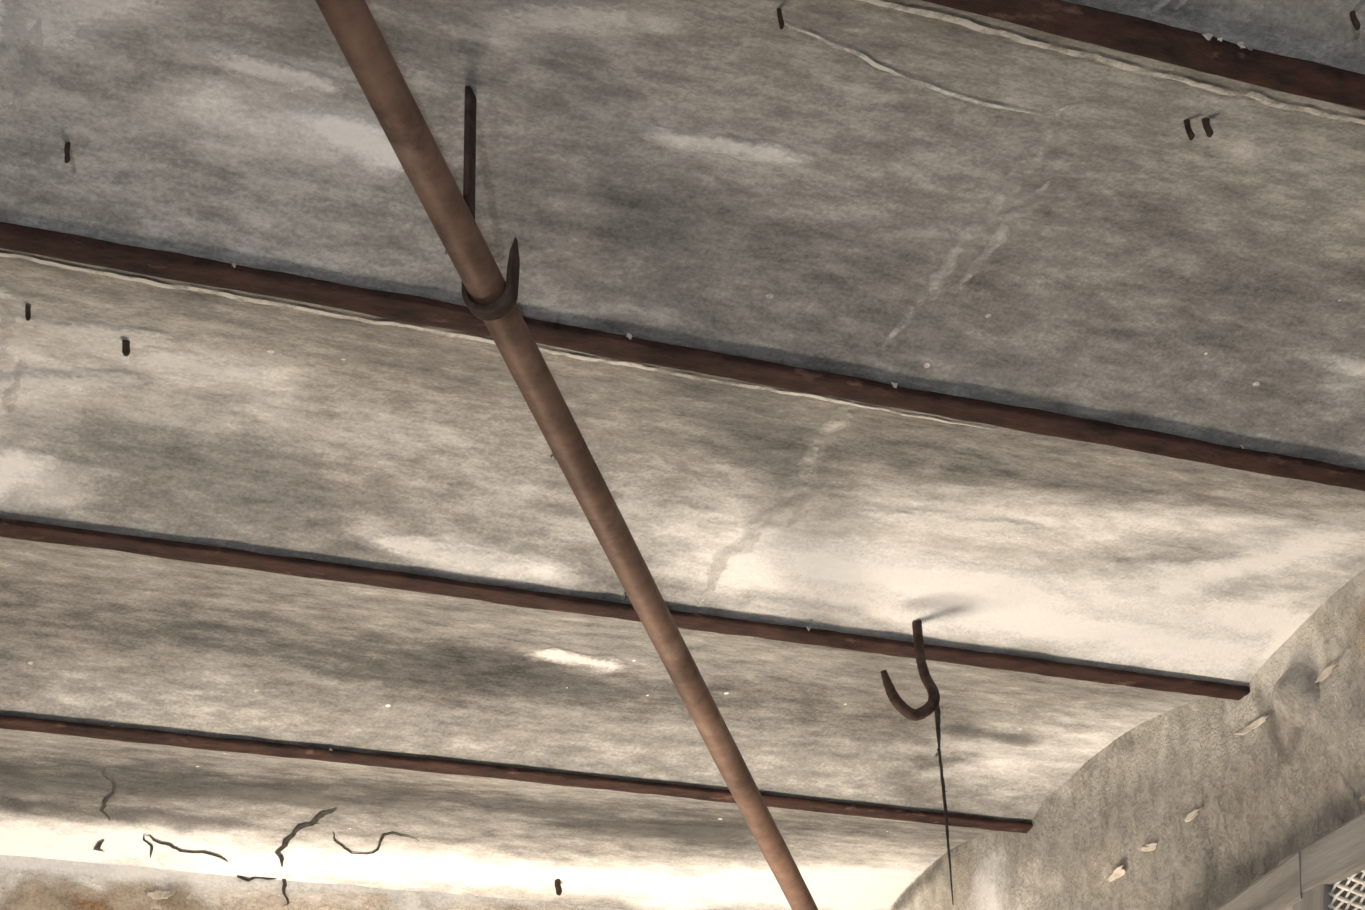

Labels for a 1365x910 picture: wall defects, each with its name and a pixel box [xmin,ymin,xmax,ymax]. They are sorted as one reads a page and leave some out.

leakage [0,0,166,50]
leakage [205,49,340,93]
leakage [646,128,806,163]
leakage [0,289,171,346]
leakage [0,371,147,396]
leakage [863,507,1050,538]
leakage [535,648,622,671]
crack [93,769,117,852]
leakage [0,802,243,830]
crack [143,809,419,906]
peeling [0,880,389,910]